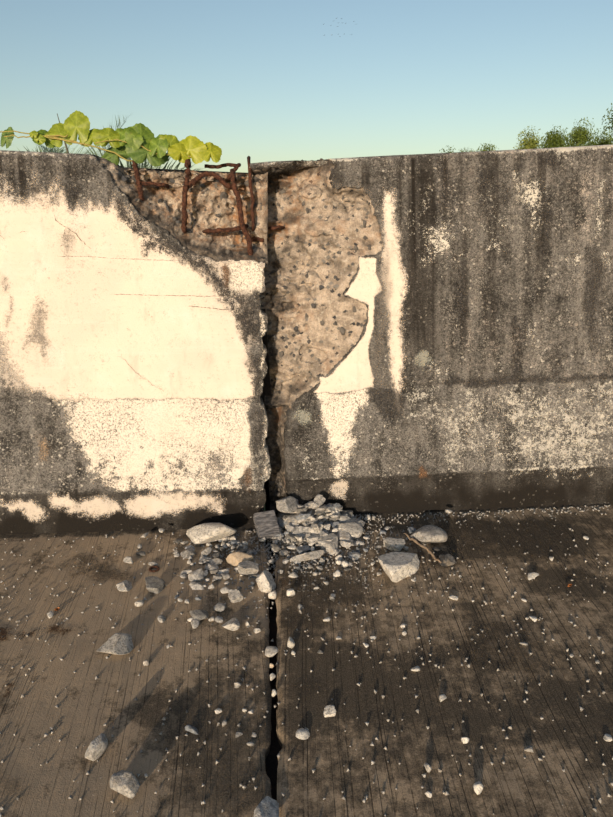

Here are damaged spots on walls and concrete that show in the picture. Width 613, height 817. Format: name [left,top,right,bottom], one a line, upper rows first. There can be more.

rust [132,160,170,201]
rust [181,156,269,255]
water stain [23,300,48,356]
water stain [112,186,267,344]
peeling [0,155,408,522]
water stain [245,354,269,496]
crack [260,309,287,513]
water stain [367,386,406,419]
water stain [443,316,613,389]
water stain [582,245,604,356]
crack [265,540,282,801]